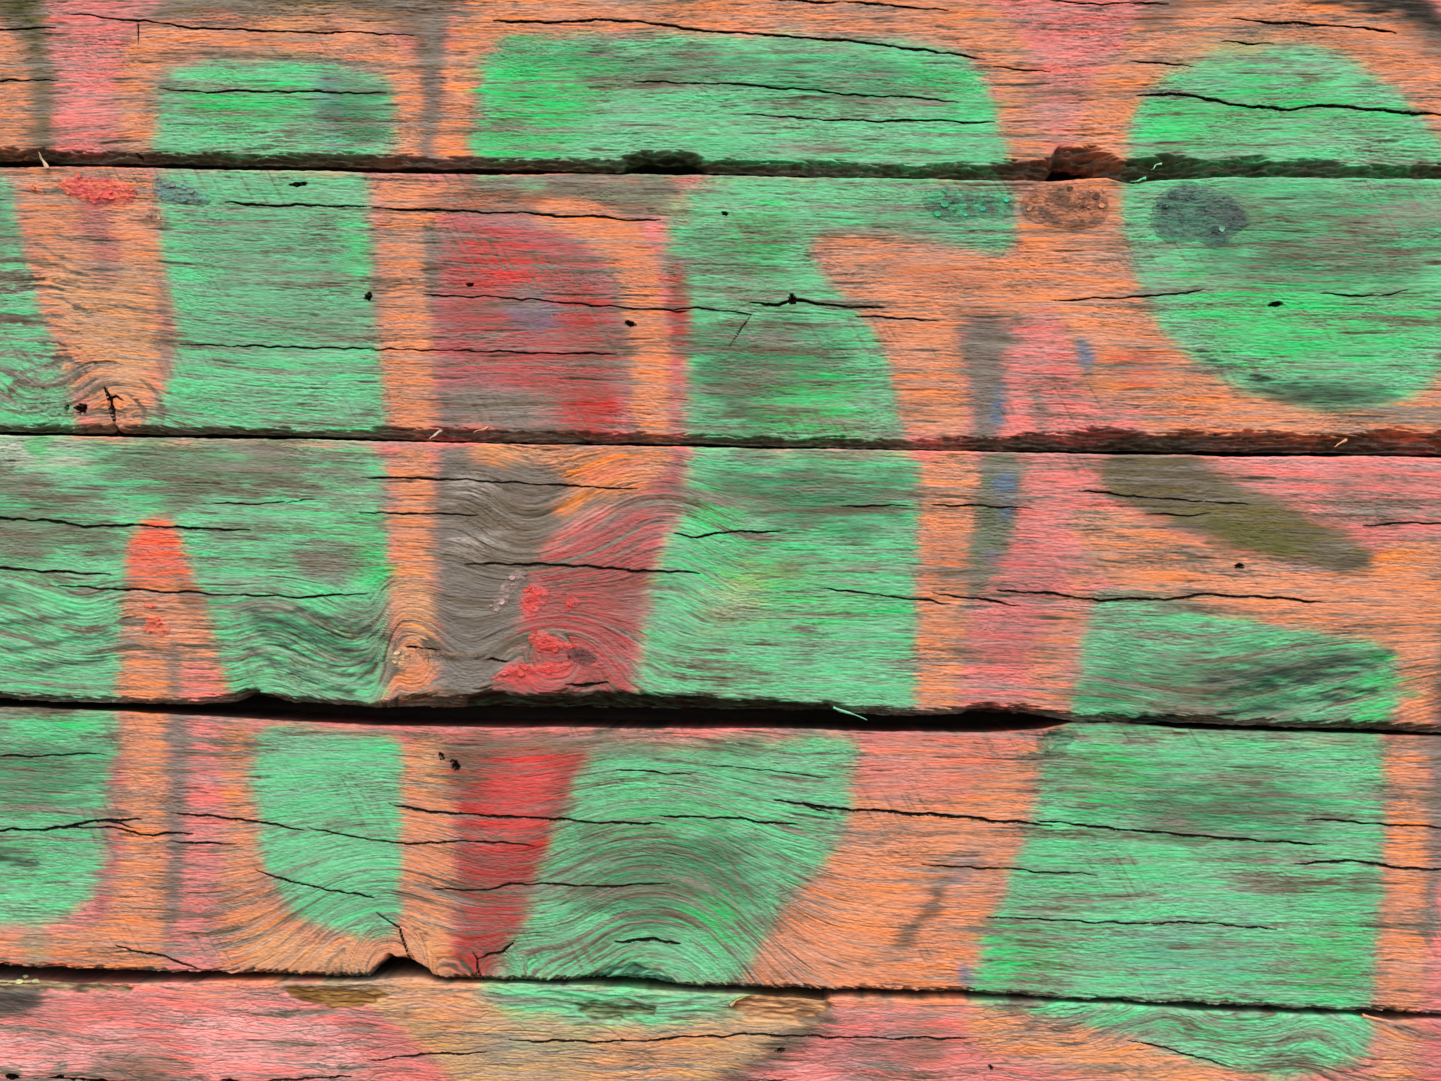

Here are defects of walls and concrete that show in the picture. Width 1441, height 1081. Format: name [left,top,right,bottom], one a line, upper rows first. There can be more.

crack [1052,0,1169,8]
crack [0,13,413,40]
crack [493,0,1049,72]
crack [1222,18,1396,45]
crack [0,76,58,84]
crack [0,765,1441,958]